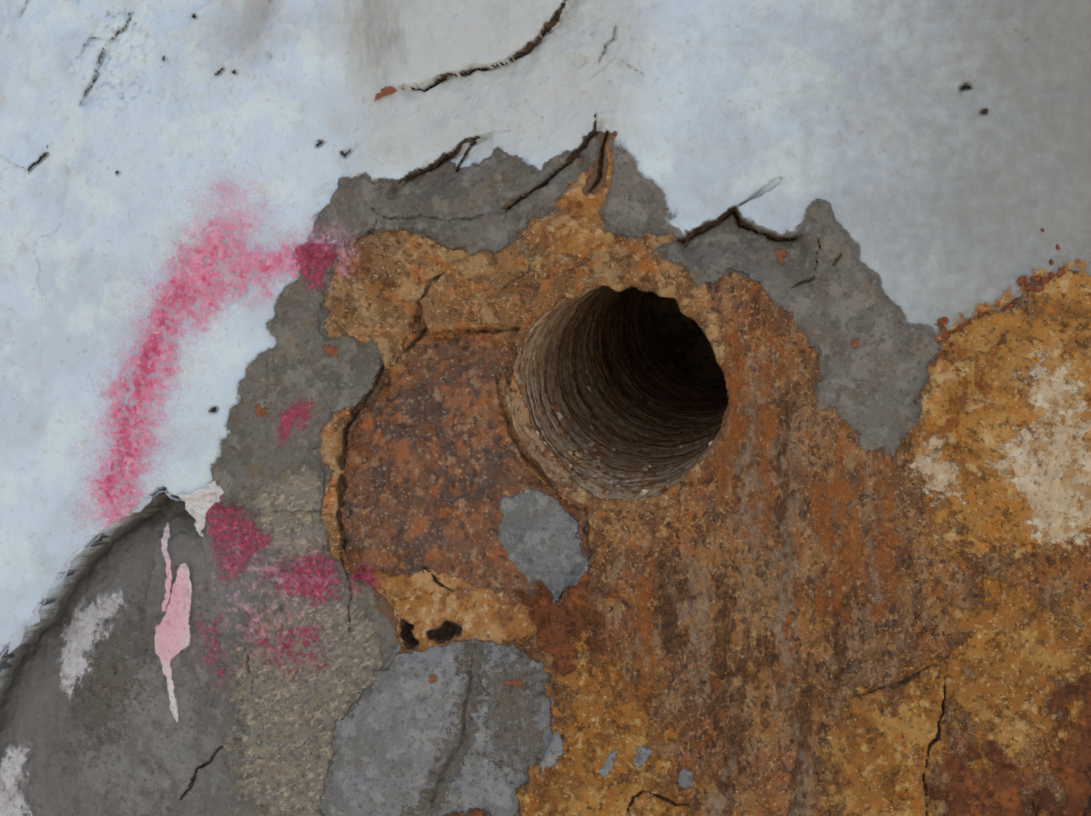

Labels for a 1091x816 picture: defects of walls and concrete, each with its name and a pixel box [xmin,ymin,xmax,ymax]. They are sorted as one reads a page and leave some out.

crack [80,13,130,104]
crack [401,0,567,92]
rust [527,135,616,259]
peeling [59,591,127,698]
peeling [0,481,224,672]
peeling [154,523,192,722]
spalling [221,207,730,816]
rust [513,259,1091,816]
peeling [0,746,32,816]
rust [443,808,485,816]